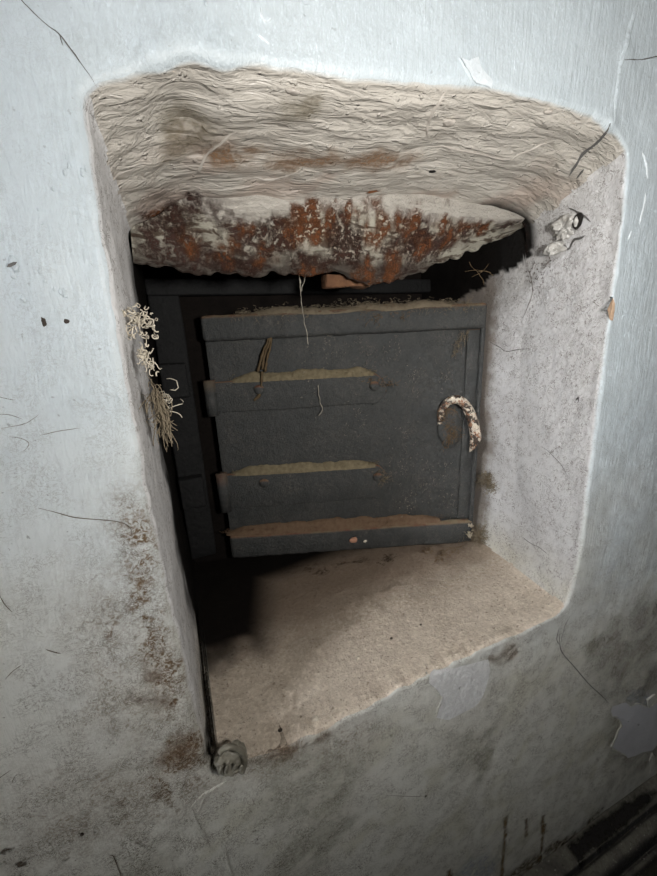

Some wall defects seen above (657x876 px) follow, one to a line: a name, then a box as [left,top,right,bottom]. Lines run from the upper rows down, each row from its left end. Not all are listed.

crack [617,54,657,62]
crack [568,123,611,179]
rust [148,203,197,260]
rust [213,190,491,285]
peeling [425,659,491,720]
peeling [610,694,657,774]
damp [500,808,603,876]